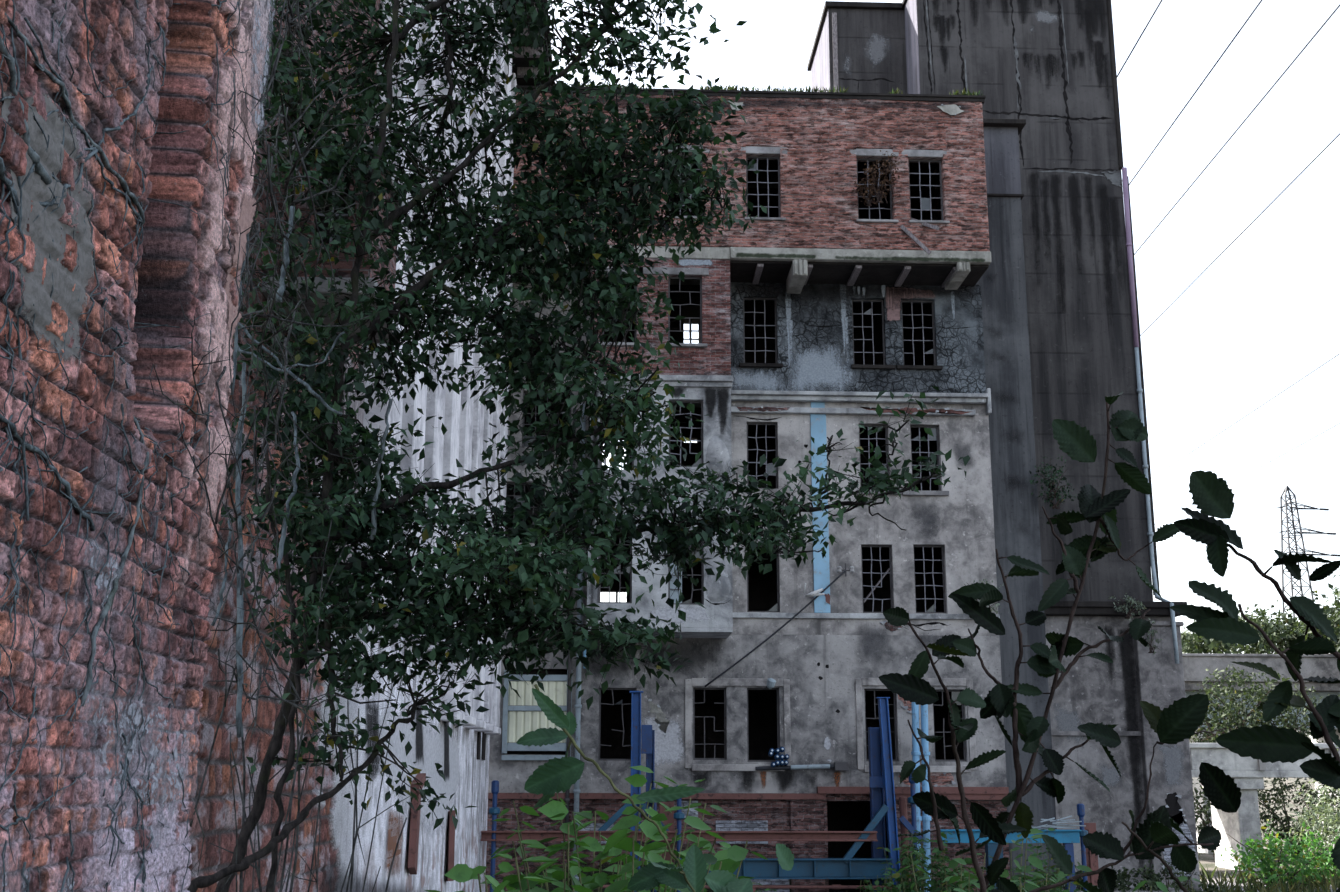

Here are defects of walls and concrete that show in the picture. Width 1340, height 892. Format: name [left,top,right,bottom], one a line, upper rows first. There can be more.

crack [839,78,893,88]
damp [932,0,955,71]
damp [971,0,1057,30]
crack [923,0,1117,177]
damp [1023,0,1109,97]
damp [1030,173,1120,309]